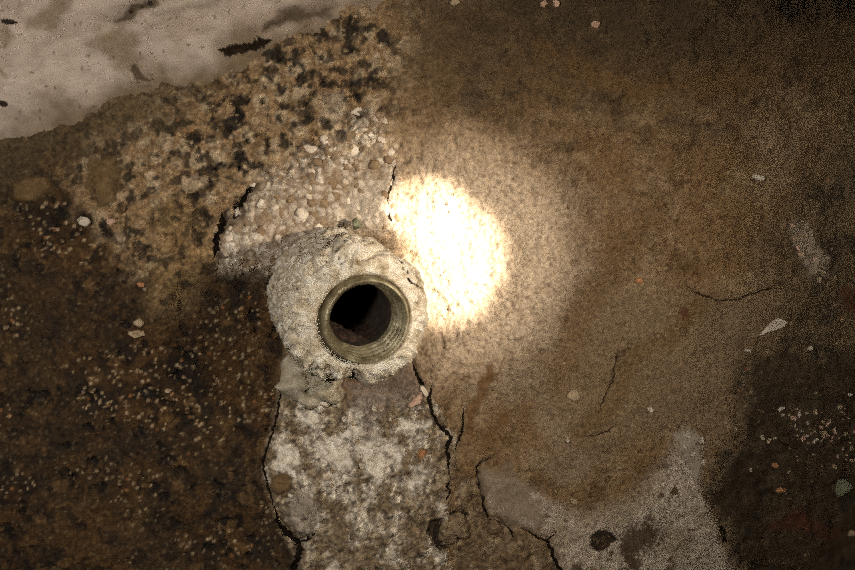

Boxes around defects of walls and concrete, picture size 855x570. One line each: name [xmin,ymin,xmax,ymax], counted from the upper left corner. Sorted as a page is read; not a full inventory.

flaking render [77,216,92,227]
spalling [225,117,401,270]
flaking render [128,318,145,339]
crack [685,284,788,302]
crack [262,393,315,570]
peeling [270,444,320,532]
peeling [295,408,432,502]
flaking render [407,385,429,408]
crack [412,361,464,500]
crack [476,457,563,570]